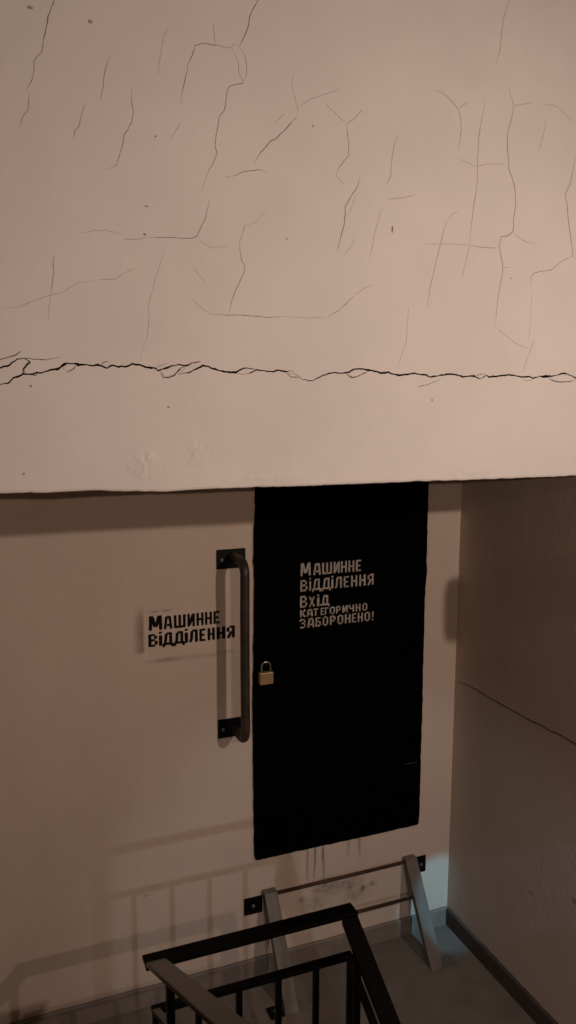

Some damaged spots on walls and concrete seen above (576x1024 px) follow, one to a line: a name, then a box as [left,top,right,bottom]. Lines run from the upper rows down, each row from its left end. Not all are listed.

crack [0,1,576,387]
crack [455,681,576,745]